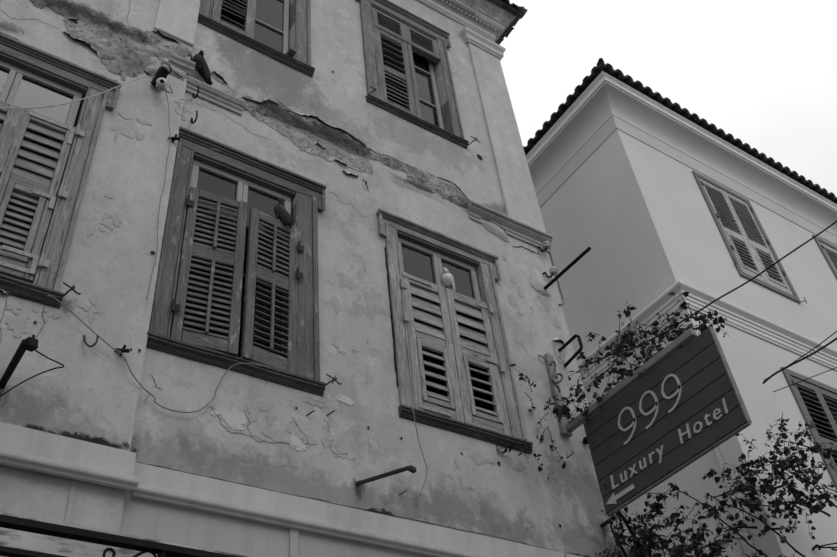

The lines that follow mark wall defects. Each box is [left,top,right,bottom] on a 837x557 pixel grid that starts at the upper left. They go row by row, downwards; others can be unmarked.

spalling [30,0,193,82]
spalling [210,71,470,208]